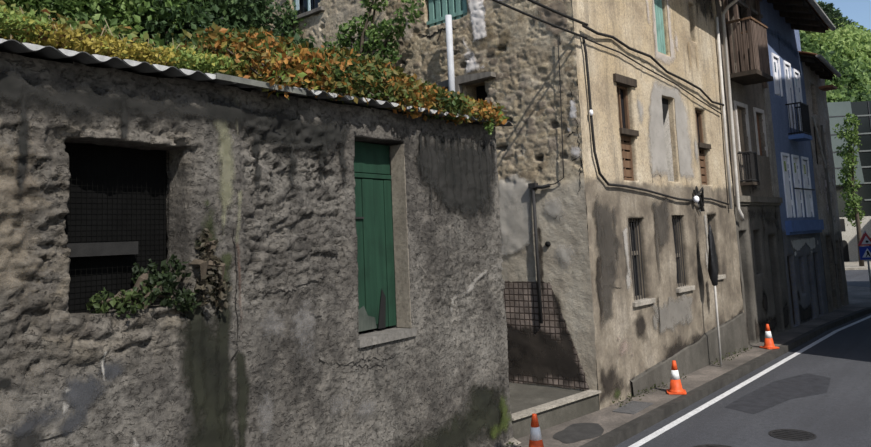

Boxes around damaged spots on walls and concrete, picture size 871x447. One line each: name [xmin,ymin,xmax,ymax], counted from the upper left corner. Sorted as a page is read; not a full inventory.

peeling [463,0,514,72]
leakage [417,133,495,219]
leakage [593,200,620,322]
leakage [653,197,670,275]
leakage [0,378,12,391]
leakage [12,352,123,447]
leakage [181,287,249,447]
leakage [400,387,505,447]
leakage [507,227,583,383]
leakage [600,369,634,402]
leakage [636,315,646,336]
leakage [666,335,702,360]